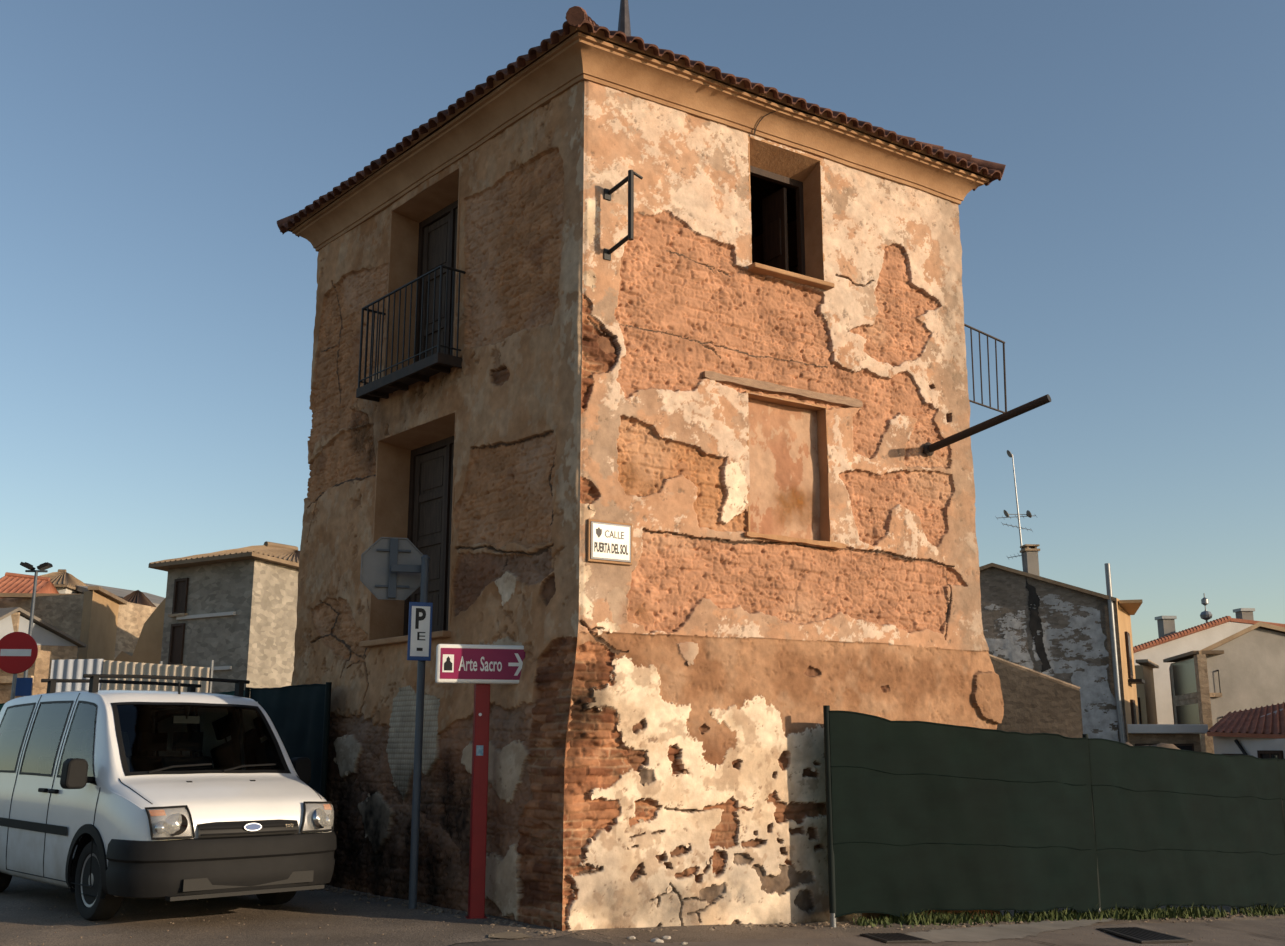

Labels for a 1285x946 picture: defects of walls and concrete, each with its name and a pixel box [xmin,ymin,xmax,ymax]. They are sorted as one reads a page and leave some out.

spalling [464,147,565,349]
peeling [583,197,601,243]
spalling [489,363,510,386]
spalling [579,210,968,666]
peeling [495,571,518,606]
spalling [312,597,372,664]
peeling [981,594,1119,742]
peeling [334,734,363,777]
peeling [358,684,440,844]
peeling [488,739,531,803]
peeling [567,656,862,931]
peeling [485,843,523,920]